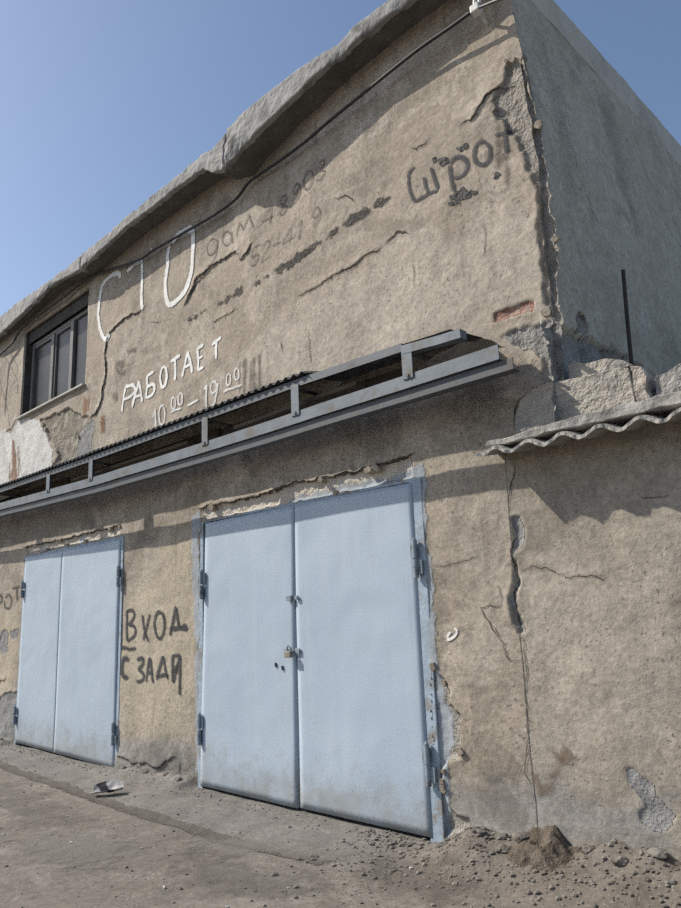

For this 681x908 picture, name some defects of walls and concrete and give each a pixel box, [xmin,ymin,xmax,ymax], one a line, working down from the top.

crack [459,86,515,126]
crack [184,242,253,305]
crack [297,230,409,297]
flaking render [489,54,637,422]
crack [92,310,157,416]
rust [9,441,20,481]
flaking render [40,408,90,465]
crack [198,452,415,509]
flaking render [508,516,526,634]
crack [481,464,606,809]
flaking render [429,662,465,760]
flaking render [626,767,675,832]